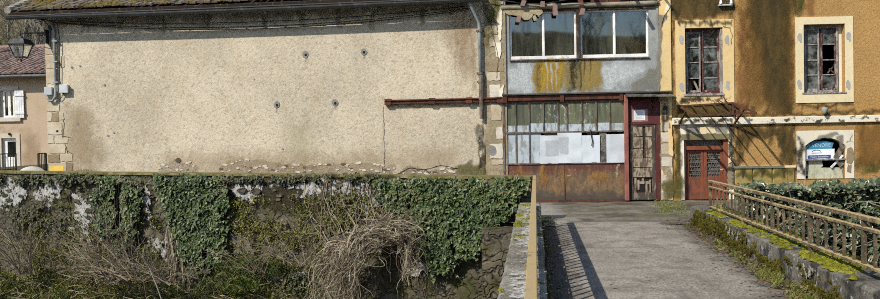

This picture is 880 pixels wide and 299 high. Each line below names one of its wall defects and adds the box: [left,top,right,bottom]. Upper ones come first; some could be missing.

leakage [518,60,602,90]
leakage [652,0,814,188]
leakage [231,173,397,211]